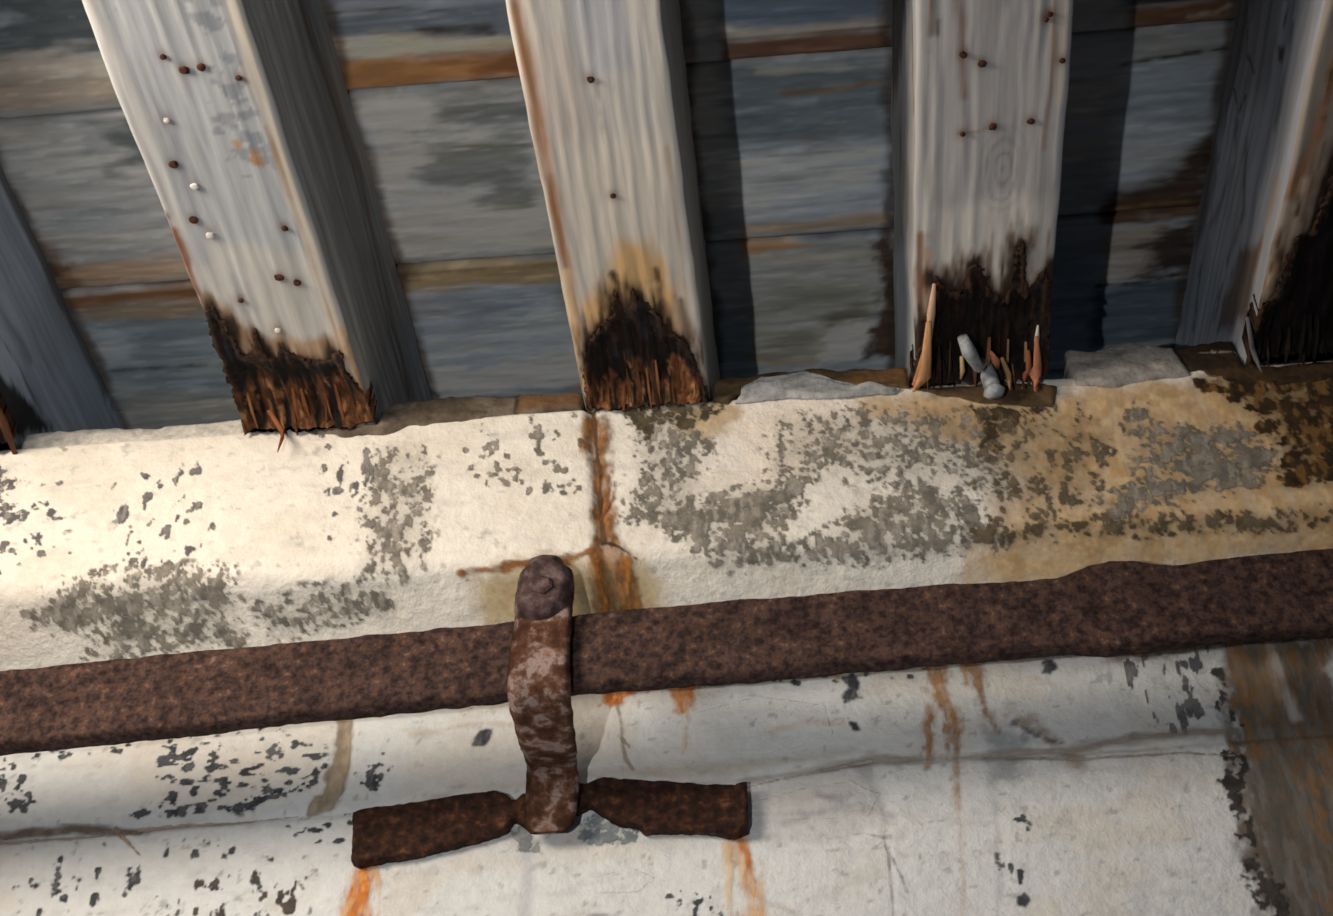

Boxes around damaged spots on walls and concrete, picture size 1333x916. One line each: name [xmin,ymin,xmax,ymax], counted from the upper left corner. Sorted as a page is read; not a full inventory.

rust [562,416,652,615]
leakage [863,378,1333,583]
rust [457,560,529,620]
rust [603,691,635,706]
rust [669,686,700,712]
rust [926,665,960,768]
rust [961,663,996,727]
leakage [1113,638,1333,916]
rust [341,866,379,916]
rust [724,839,763,916]